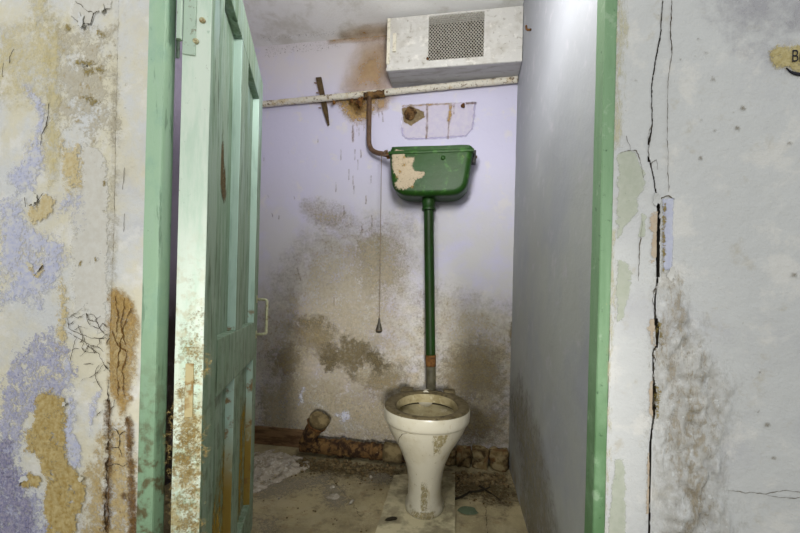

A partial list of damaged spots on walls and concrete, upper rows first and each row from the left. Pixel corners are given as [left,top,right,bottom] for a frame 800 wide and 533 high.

spalling [75,59,104,76]
corrosion [328,47,385,139]
spalling [402,106,425,126]
crack [619,0,673,199]
peeling [0,326,86,533]
peeling [0,84,110,333]
crack [67,313,125,532]
leakage [263,238,407,442]
leakage [439,305,507,445]
peeling [615,151,676,281]
crack [638,223,656,317]
spalling [647,319,664,346]